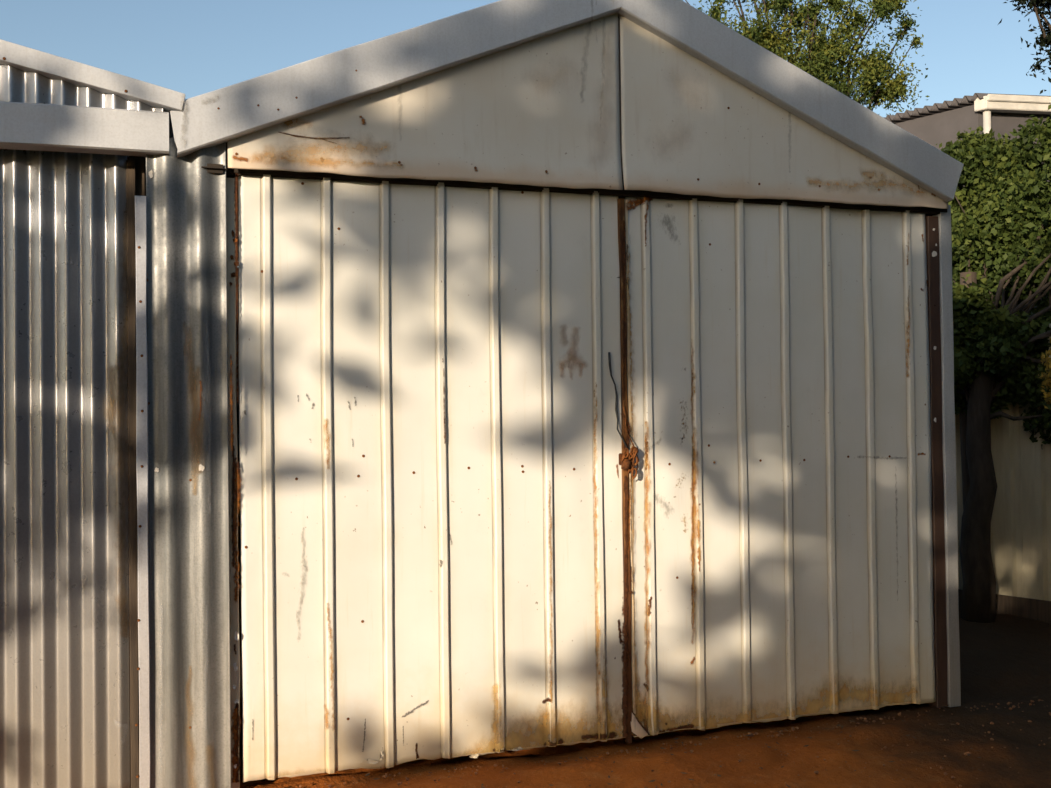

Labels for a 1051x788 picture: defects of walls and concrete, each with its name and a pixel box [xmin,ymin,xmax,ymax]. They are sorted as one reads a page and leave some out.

rust [230,156,248,602]
rust [582,196,694,740]
rust [676,352,701,643]
rust [231,702,241,783]
rust [325,608,335,728]